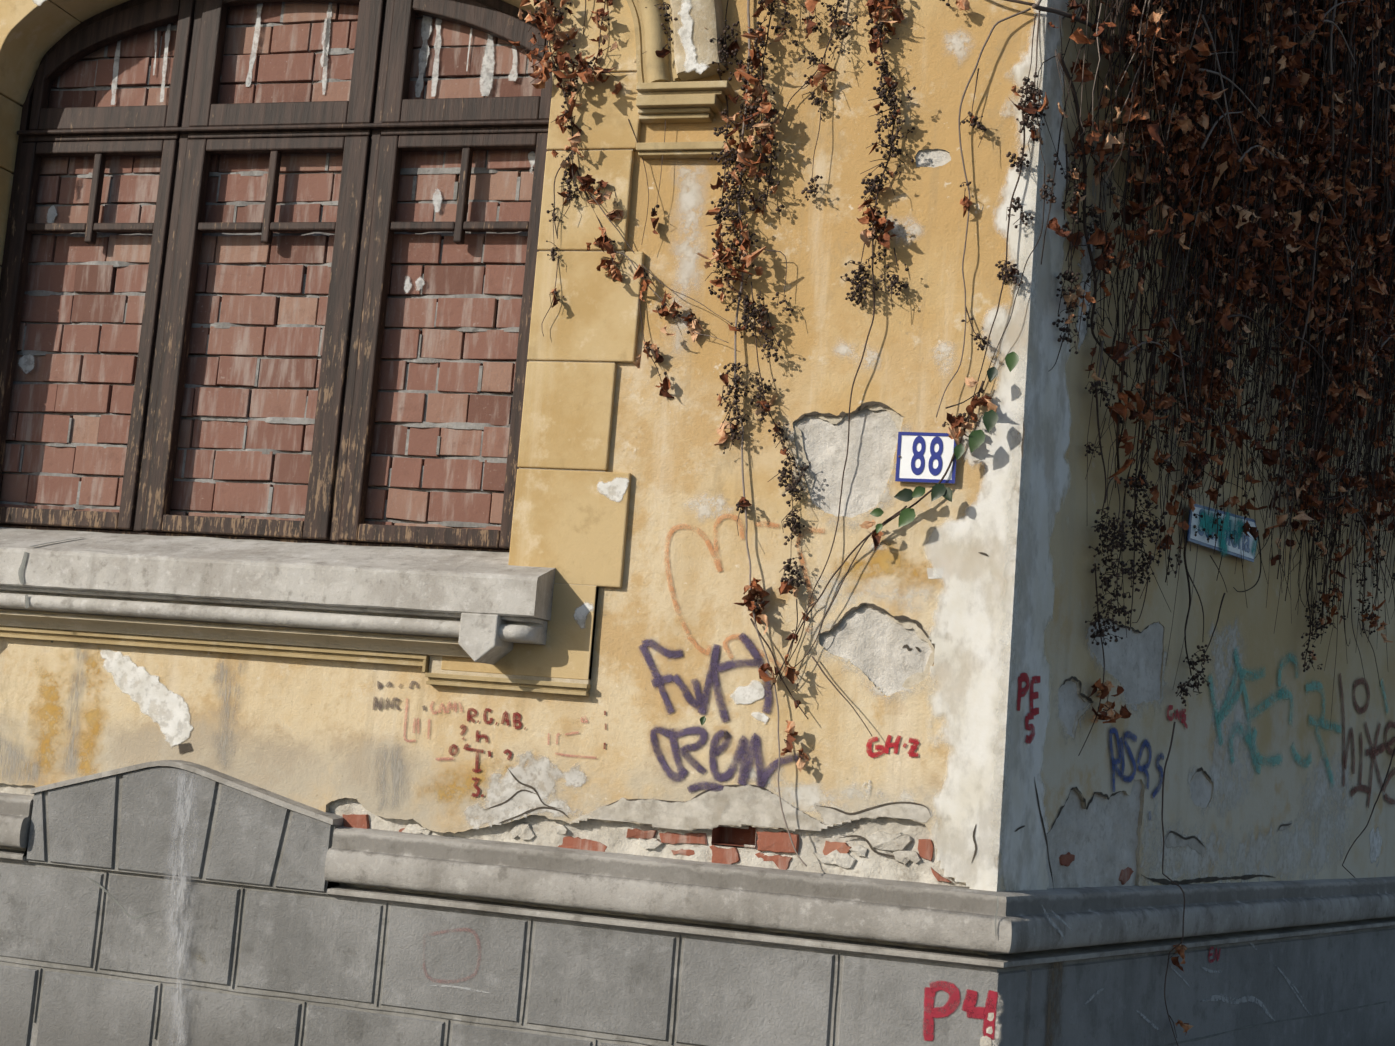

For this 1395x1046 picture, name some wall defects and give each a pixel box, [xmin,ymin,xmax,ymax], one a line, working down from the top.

spalling [915,149,951,168]
spalling [788,401,909,526]
peeling [100,650,193,754]
spalling [811,603,935,696]
spalling [1058,676,1093,738]
spalling [1087,618,1166,711]
spalling [0,783,35,796]
spalling [330,751,966,887]
spalling [1045,780,1276,888]